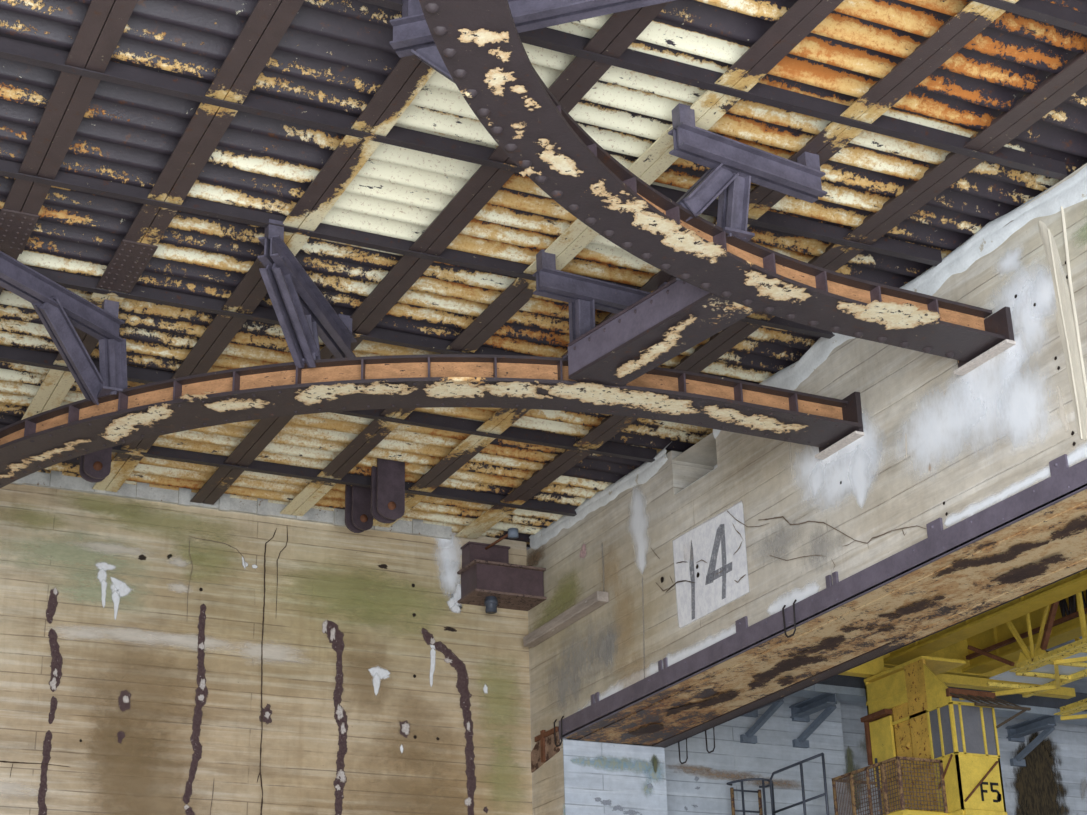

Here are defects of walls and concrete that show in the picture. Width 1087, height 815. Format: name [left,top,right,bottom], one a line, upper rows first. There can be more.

leakage [905,206,1087,467]
leakage [631,492,647,573]
crack [650,511,926,592]
leakage [789,419,878,507]
leakage [945,467,1051,526]
leakage [768,584,819,615]
crack [187,528,288,815]
leakage [579,626,736,711]
leakage [1011,733,1069,815]